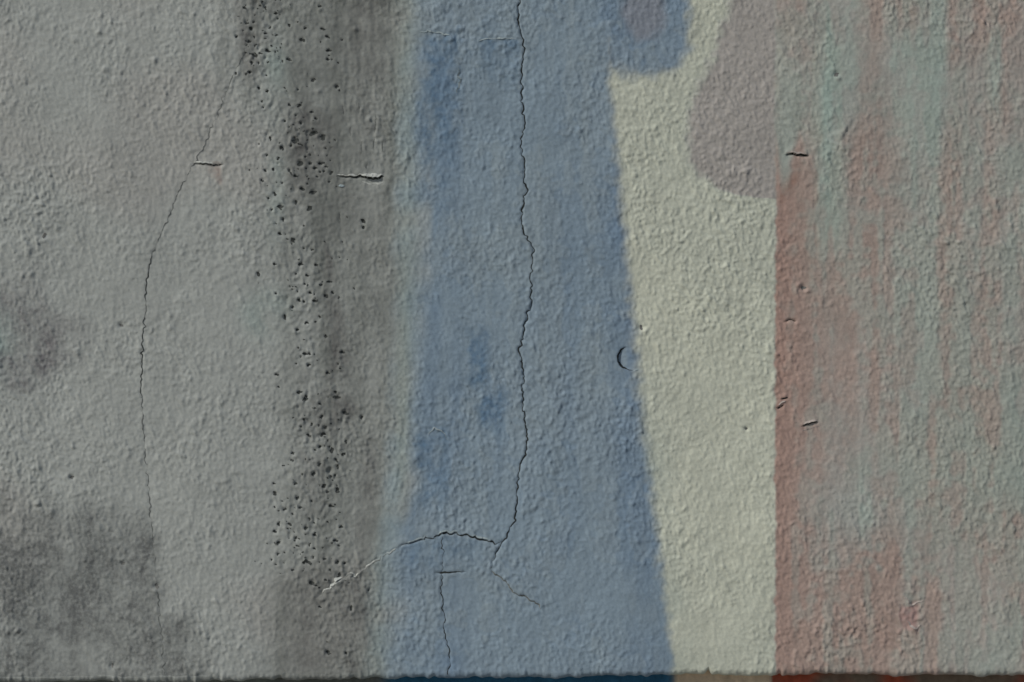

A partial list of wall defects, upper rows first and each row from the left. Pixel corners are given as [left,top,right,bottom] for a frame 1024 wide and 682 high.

water stain [231,0,285,88]
hole [235,0,307,76]
spalling [258,78,384,320]
water stain [278,0,394,202]
crack [140,44,247,674]
water stain [274,241,391,674]
crack [322,0,540,674]